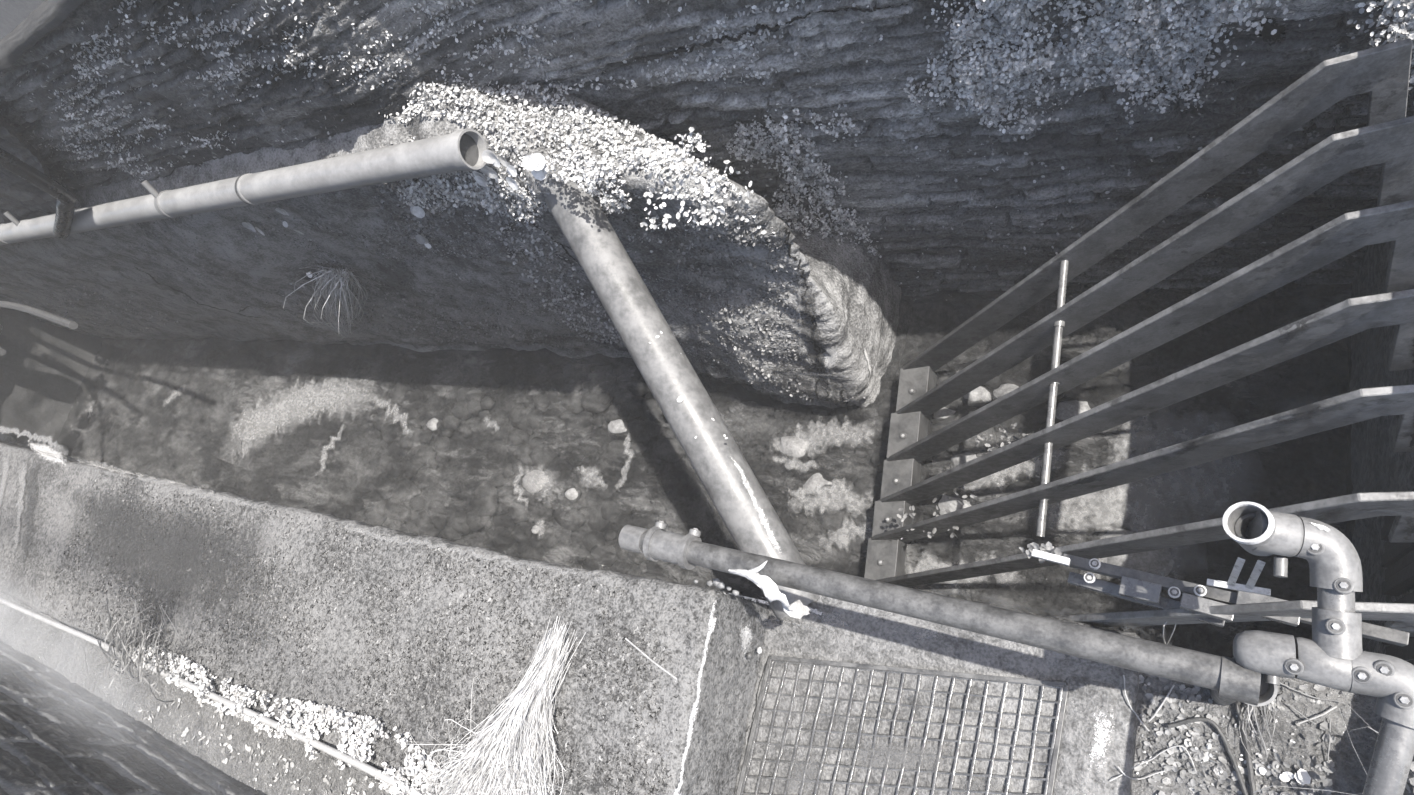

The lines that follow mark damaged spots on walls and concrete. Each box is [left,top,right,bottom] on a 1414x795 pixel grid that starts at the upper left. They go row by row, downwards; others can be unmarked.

water stain [232,383,359,454]
water stain [377,399,408,433]
water stain [0,459,26,546]
water stain [514,471,553,501]
water stain [583,438,632,486]
water stain [775,423,868,470]
water stain [796,484,872,547]
water stain [910,555,940,574]